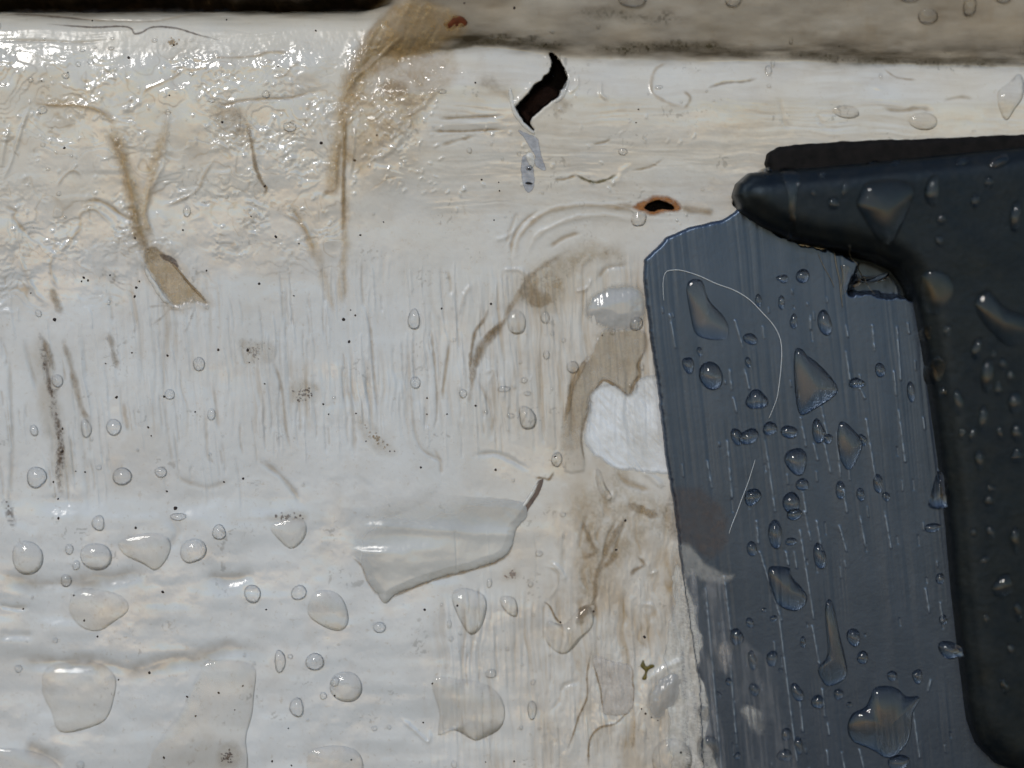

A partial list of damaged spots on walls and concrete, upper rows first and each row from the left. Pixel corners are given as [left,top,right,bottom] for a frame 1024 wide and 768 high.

rust [634,197,680,214]
peeling [145,249,204,304]
peeling [565,329,668,473]